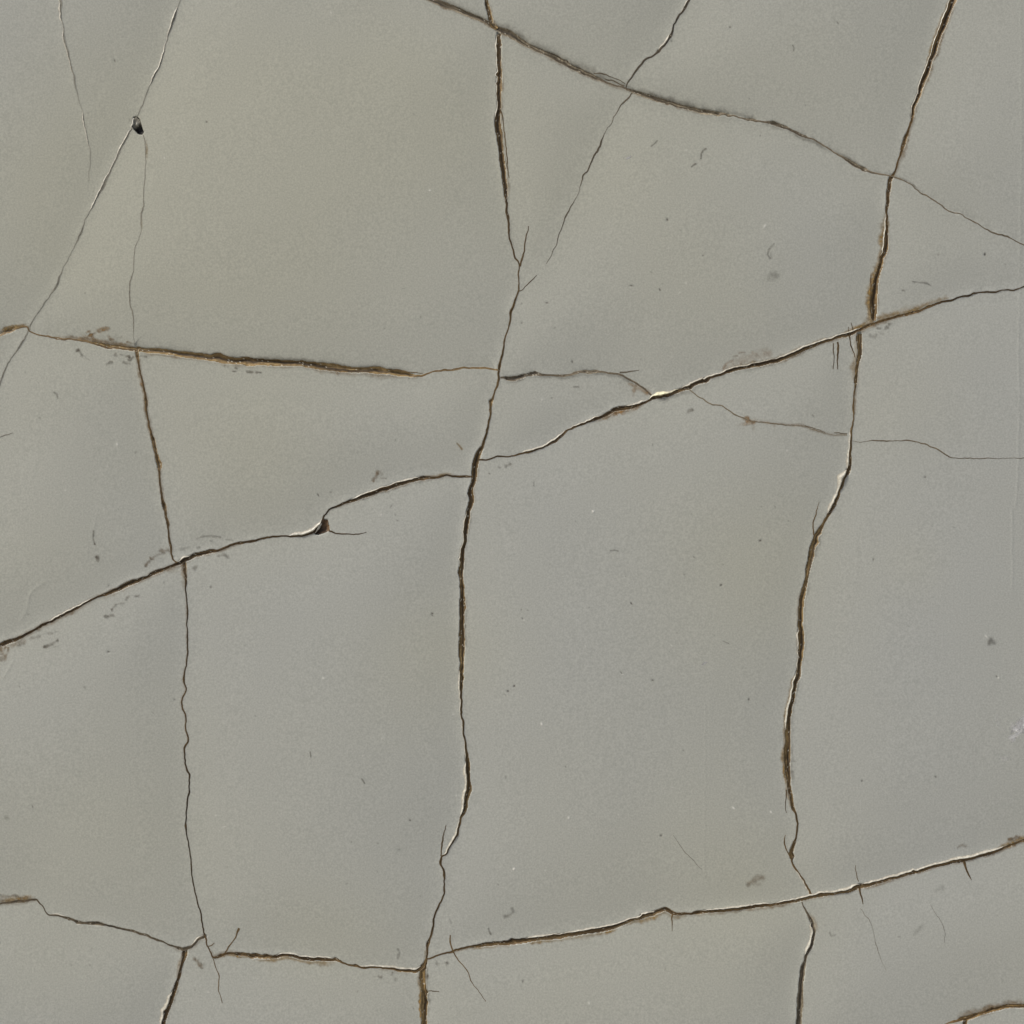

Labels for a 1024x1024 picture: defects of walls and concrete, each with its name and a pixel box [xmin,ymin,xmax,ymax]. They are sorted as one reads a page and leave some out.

crack [58,0,91,177]
crack [137,0,181,116]
crack [0,128,498,1024]
crack [418,0,1024,1024]